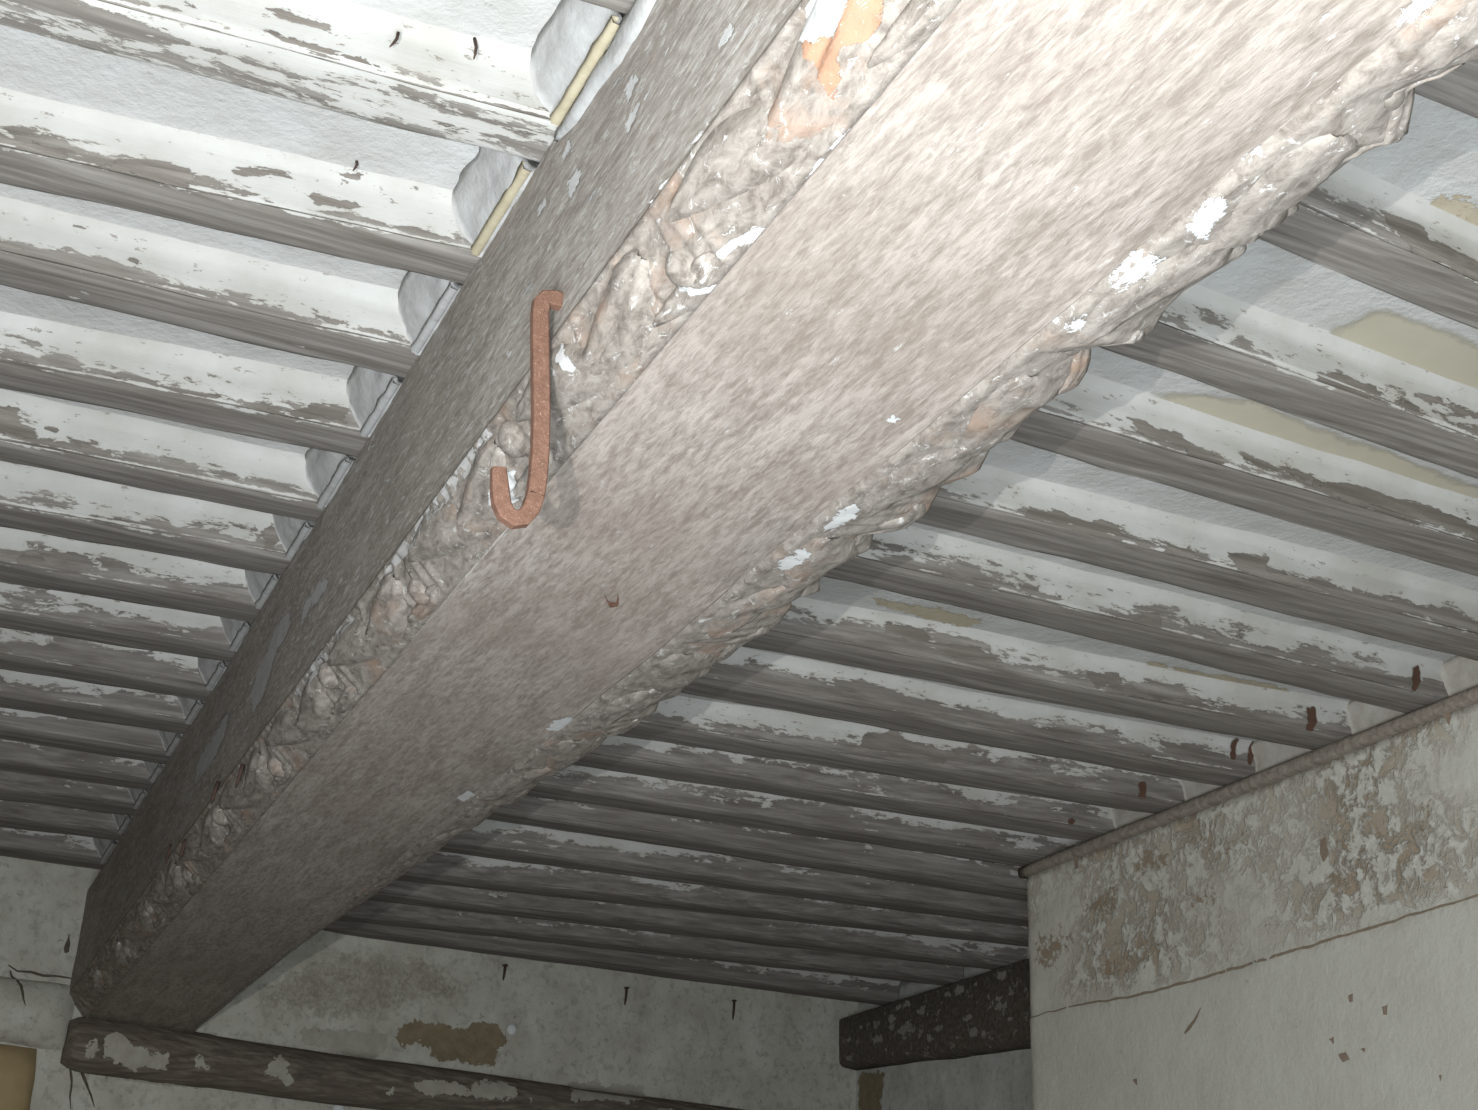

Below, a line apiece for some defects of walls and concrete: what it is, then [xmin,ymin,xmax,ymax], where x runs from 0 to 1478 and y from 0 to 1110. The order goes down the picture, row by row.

peeling [264,8,380,71]
peeling [798,0,848,44]
spalling [550,15,619,203]
peeling [94,158,195,189]
peeling [232,166,291,179]
peeling [308,172,363,209]
peeling [1186,193,1228,240]
peeling [1382,211,1478,281]
peeling [376,428,493,586]
peeling [1127,417,1478,540]
crack [1030,894,1478,1034]
spalling [395,1017,509,1067]